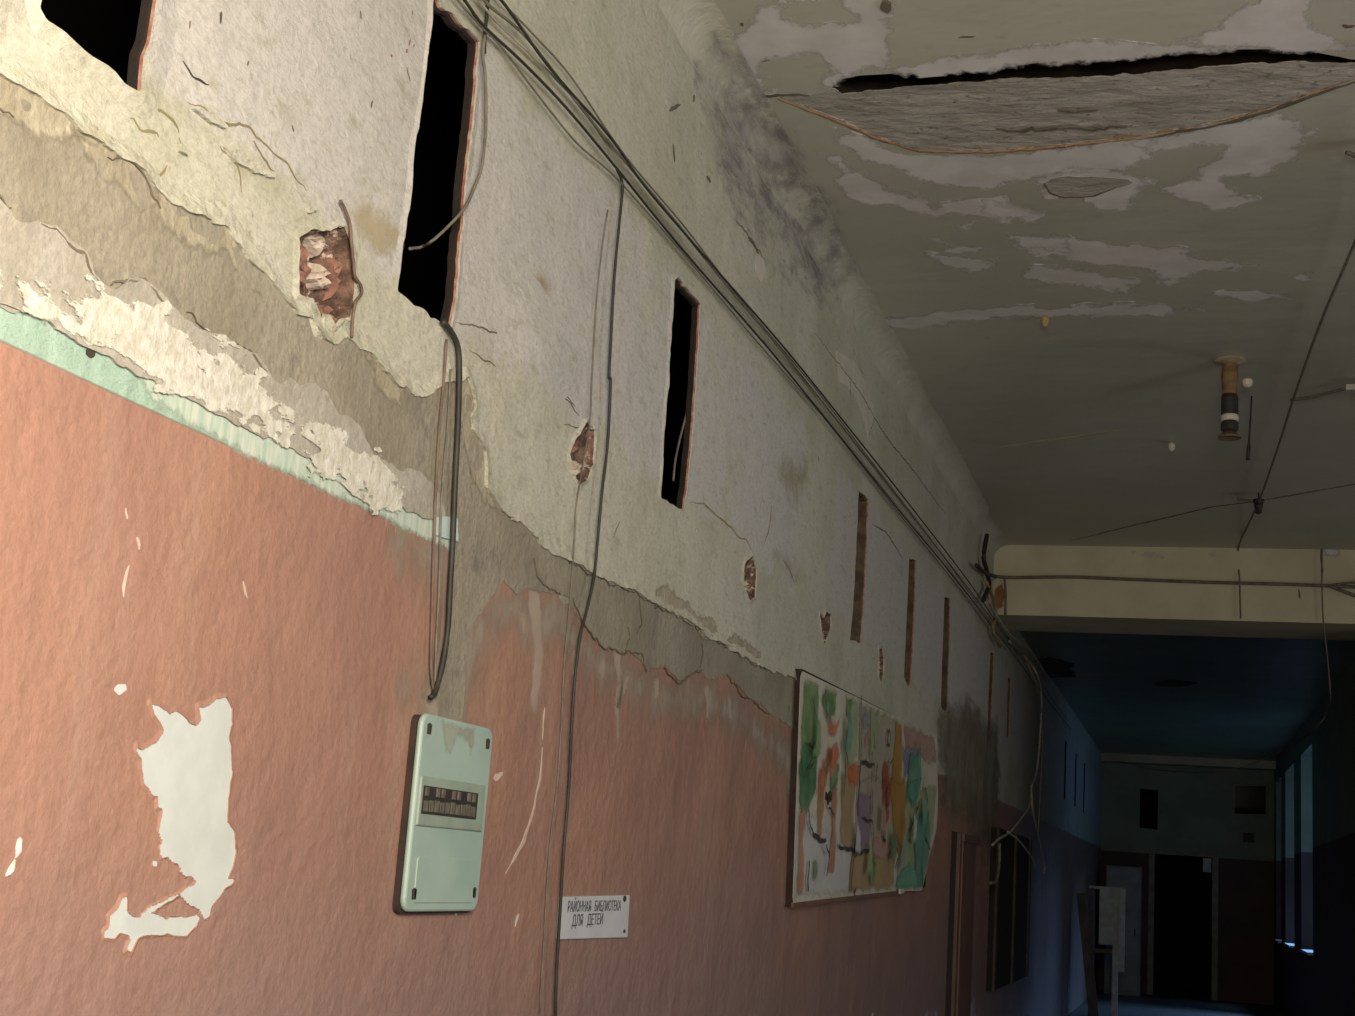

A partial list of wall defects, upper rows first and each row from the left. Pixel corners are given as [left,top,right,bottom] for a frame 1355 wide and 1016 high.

damp [715,39,858,290]
spalling [731,0,1355,329]
flaking render [0,55,797,729]
peeling [836,351,876,443]
peeling [101,693,238,958]